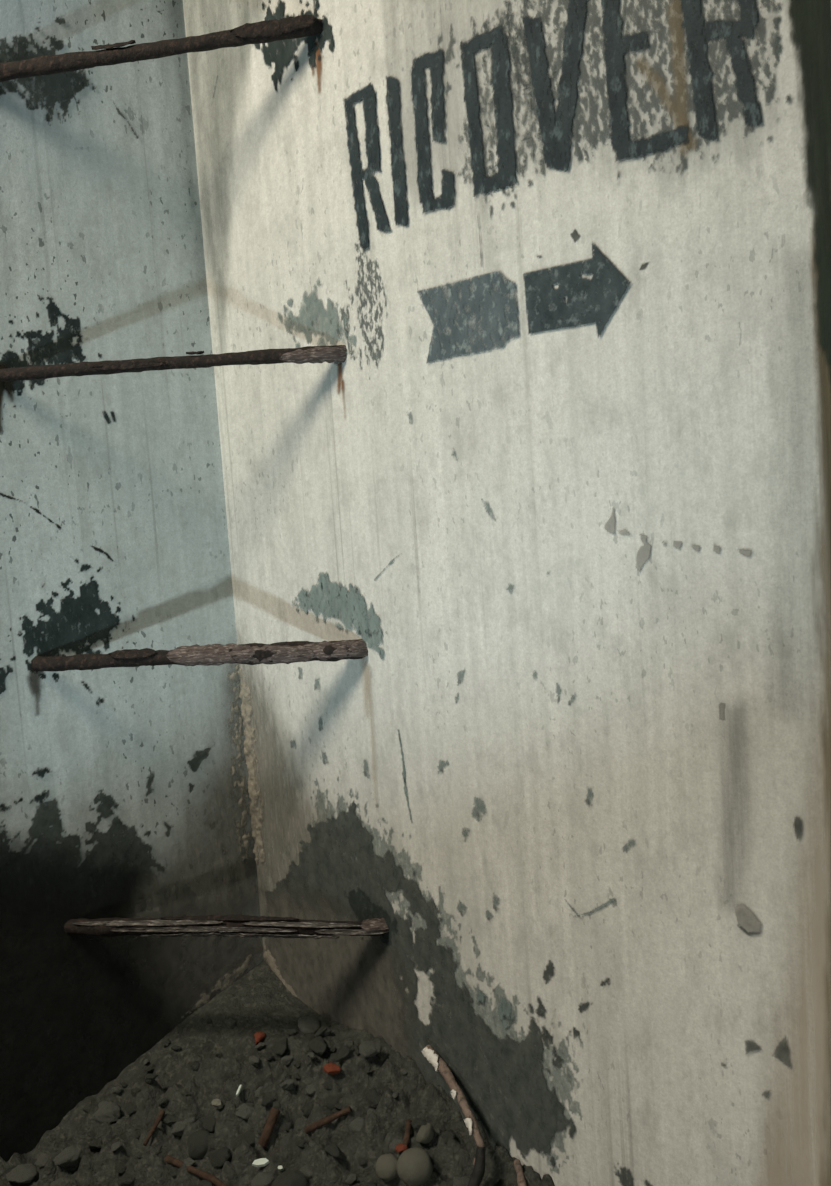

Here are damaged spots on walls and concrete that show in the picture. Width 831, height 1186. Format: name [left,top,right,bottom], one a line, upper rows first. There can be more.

peeling [0,17,65,63]
peeling [0,68,95,122]
rust [312,41,321,91]
rust [0,364,13,431]
peeling [0,559,135,694]
peeling [292,572,384,659]
rust [29,668,43,705]
peeling [187,748,211,792]
peeling [0,768,165,900]
damp [0,664,406,1162]
peeling [265,780,582,1173]